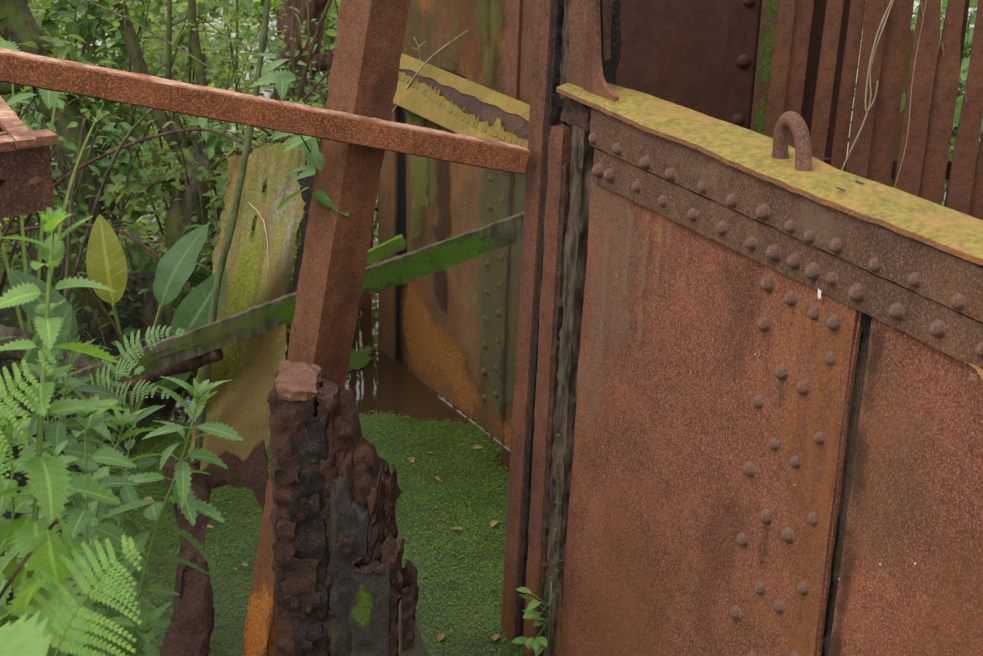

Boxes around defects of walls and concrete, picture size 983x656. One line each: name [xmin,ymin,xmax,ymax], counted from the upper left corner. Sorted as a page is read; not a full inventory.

peeling [398,70,529,149]
damp [271,177,296,273]
rust [403,282,480,417]